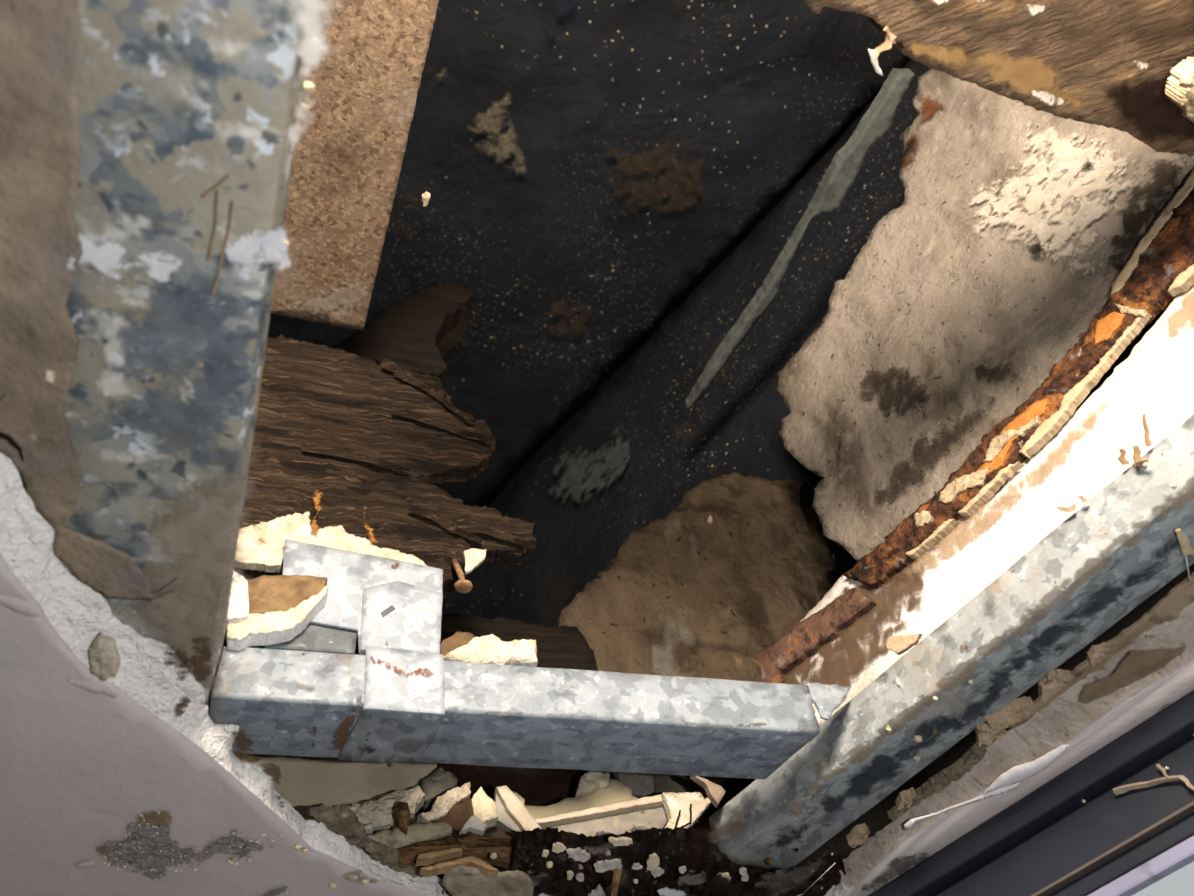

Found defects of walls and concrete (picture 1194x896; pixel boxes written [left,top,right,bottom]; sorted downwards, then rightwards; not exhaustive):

peeling [910,43,1081,109]
corrosion [903,95,945,167]
water stain [859,368,929,419]
water stain [975,362,1018,383]
peeling [939,416,1041,504]
peeling [463,548,487,574]
peeling [914,510,934,529]
water stain [783,397,1111,697]
spalling [0,453,435,894]
water stain [770,477,1194,847]
spalling [839,602,1194,886]
peeling [567,852,664,896]